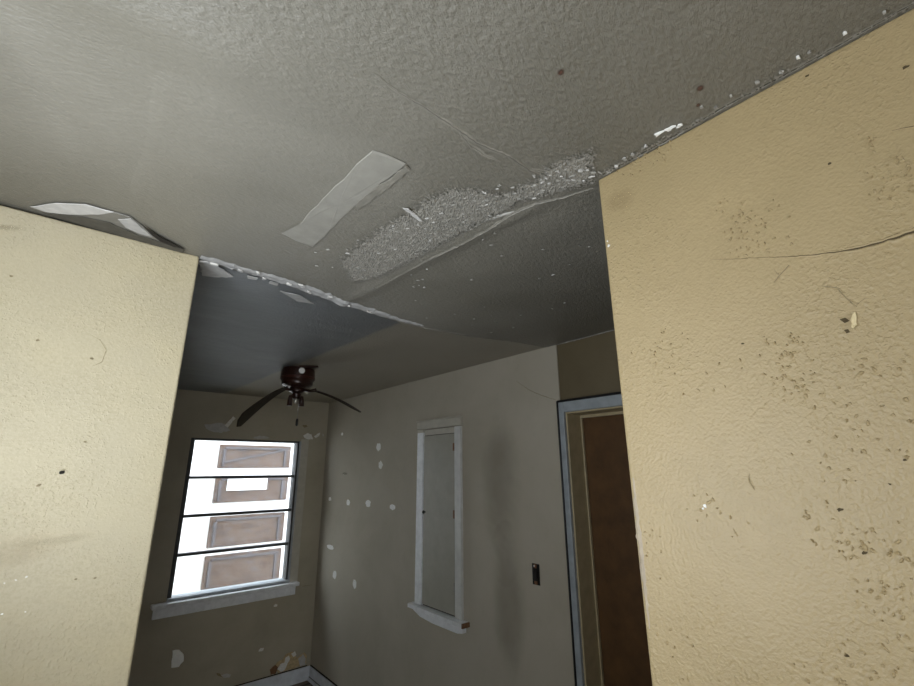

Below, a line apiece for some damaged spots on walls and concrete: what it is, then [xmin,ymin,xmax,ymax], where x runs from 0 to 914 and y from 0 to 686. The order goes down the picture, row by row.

flaking render [332,2,914,283]
peeling [282,150,411,253]
flaking render [199,256,544,347]
crack [718,226,914,282]
crack [822,285,871,307]